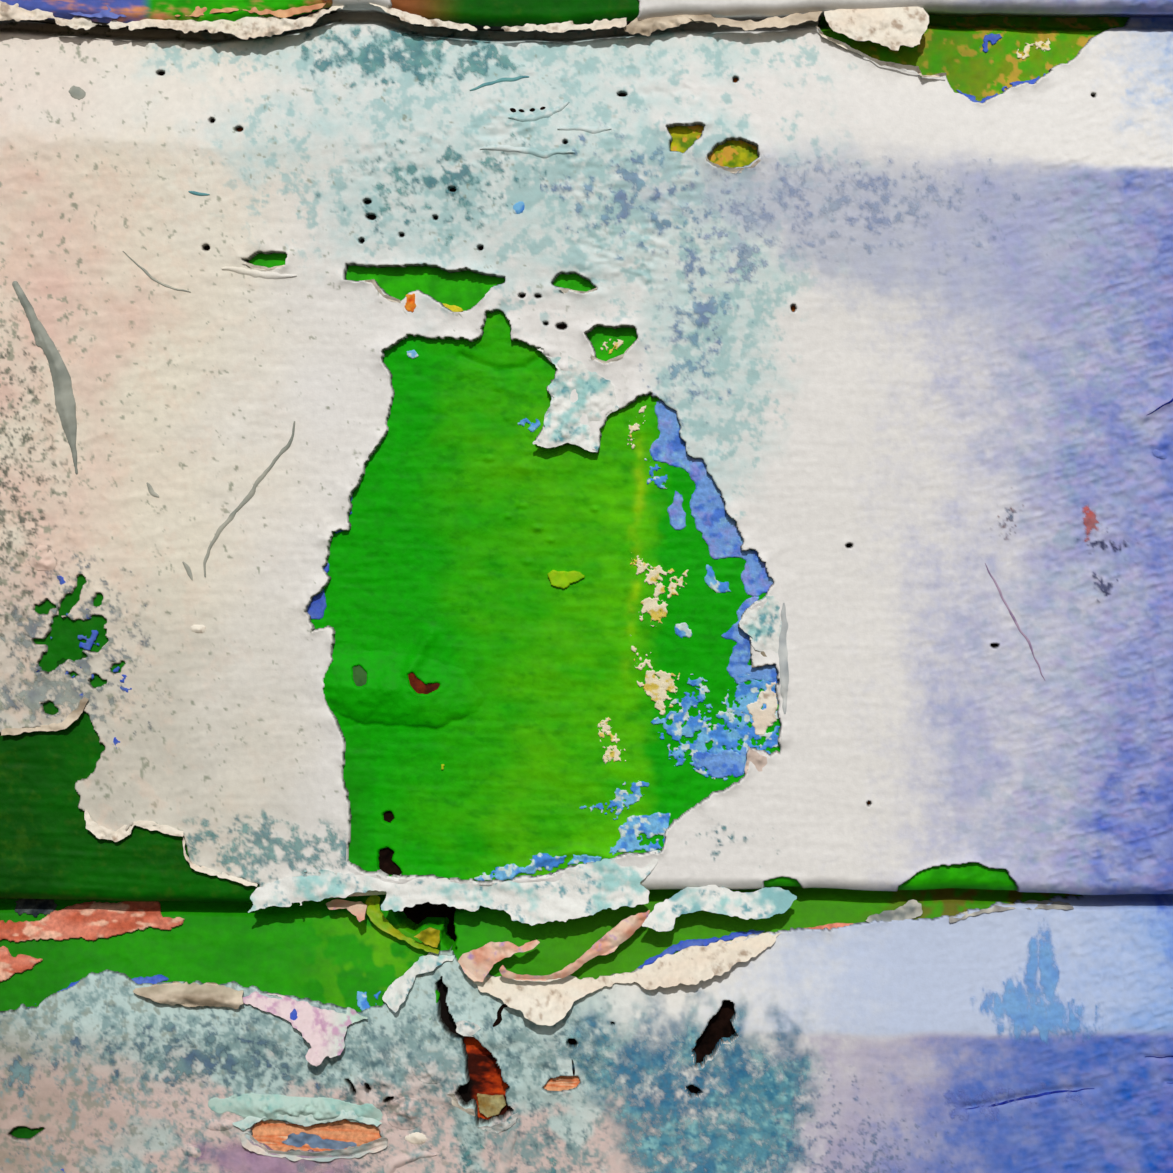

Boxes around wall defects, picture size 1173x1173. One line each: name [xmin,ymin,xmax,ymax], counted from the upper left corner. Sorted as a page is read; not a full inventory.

peeling [0,0,344,40]
peeling [370,0,1129,103]
peeling [668,125,704,153]
peeling [706,140,761,173]
peeling [346,266,505,312]
peeling [553,274,597,293]
peeling [0,310,1081,1067]